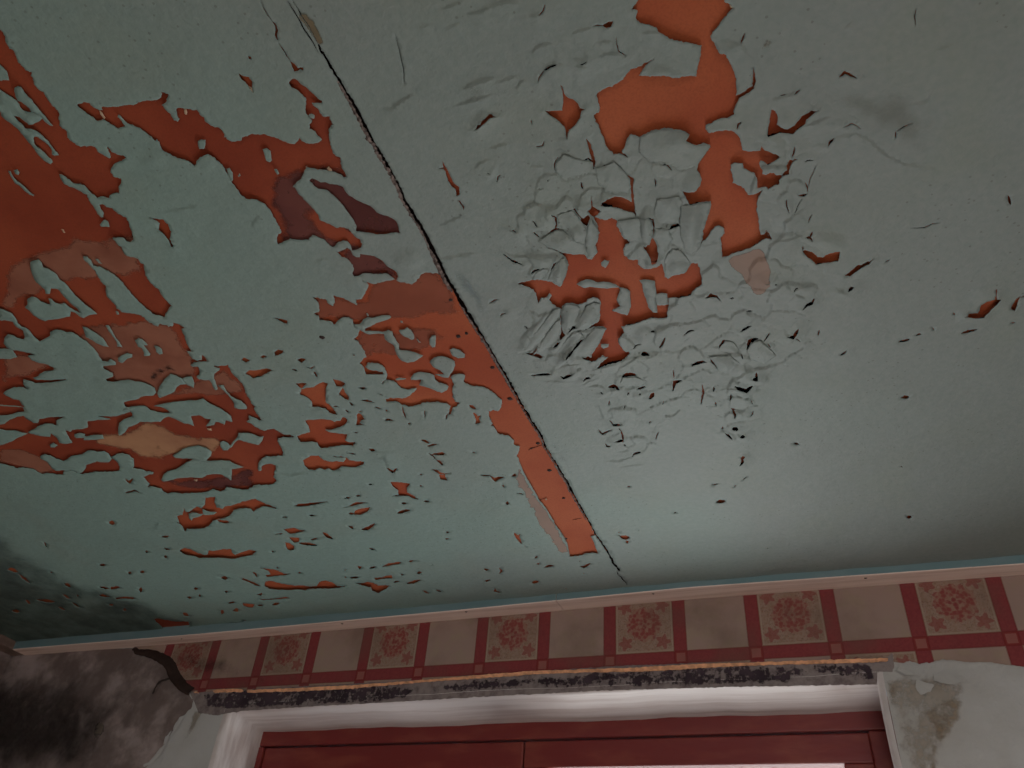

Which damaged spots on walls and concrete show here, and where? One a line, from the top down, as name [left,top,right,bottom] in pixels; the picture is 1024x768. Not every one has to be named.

peeling [768,110,817,135]
peeling [519,0,797,368]
peeling [802,214,840,264]
peeling [0,30,607,574]
crack [264,2,626,583]
peeling [609,373,664,403]
water stain [0,686,97,764]
water stain [890,680,959,768]